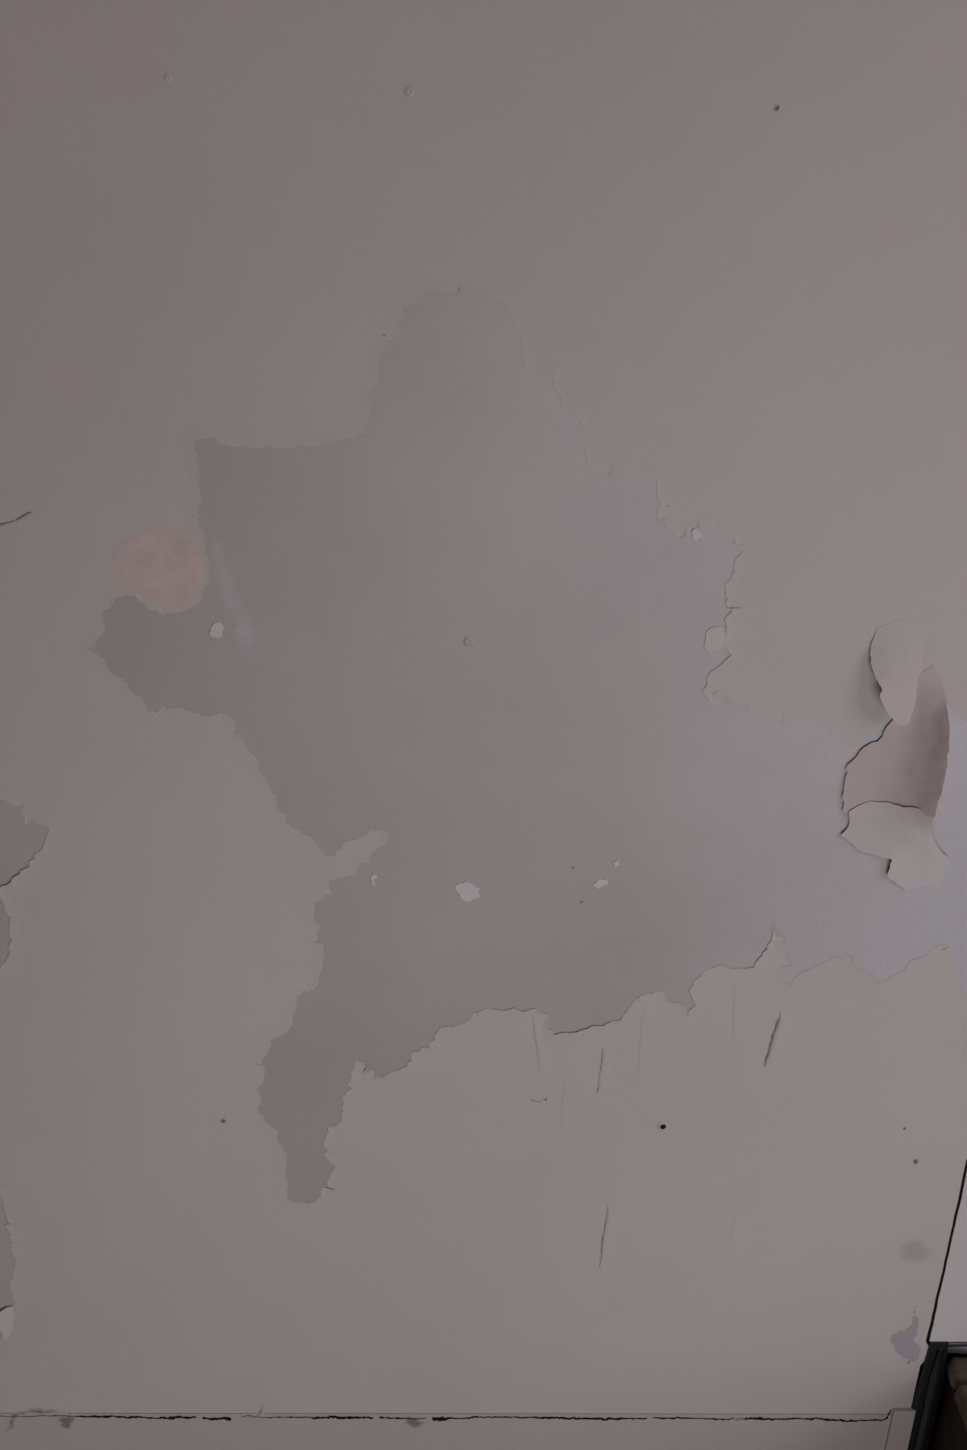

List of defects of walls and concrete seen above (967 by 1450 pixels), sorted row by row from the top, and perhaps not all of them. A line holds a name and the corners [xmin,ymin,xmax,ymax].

peeling [79,275,967,1210]
crack [0,1409,892,1422]